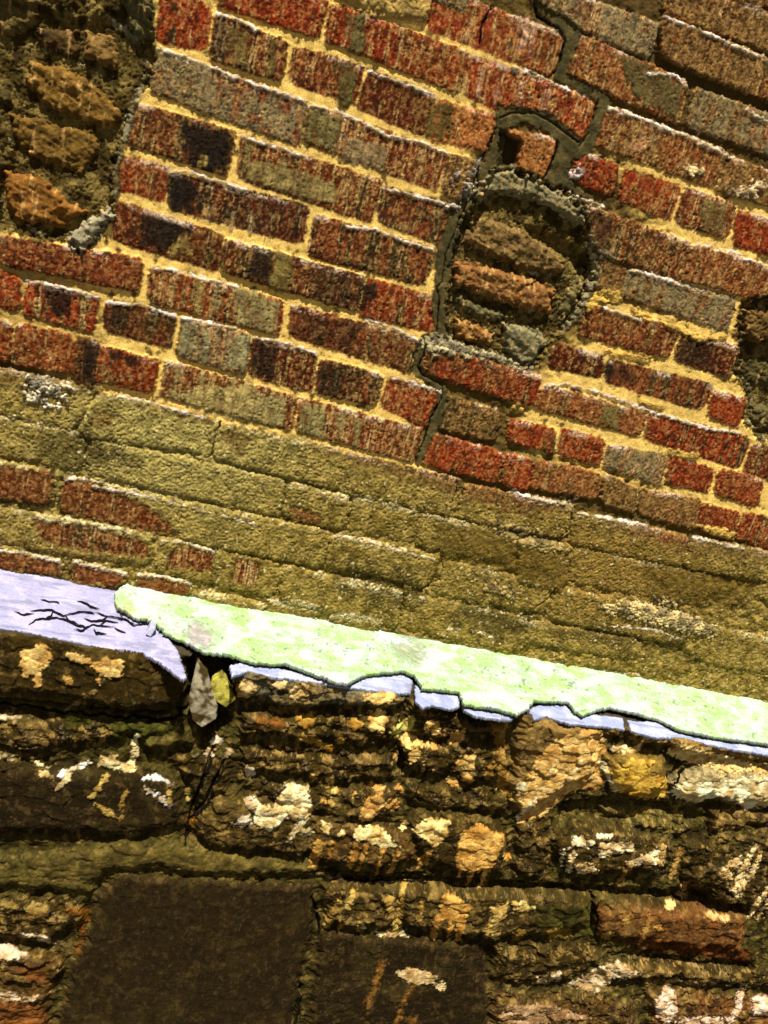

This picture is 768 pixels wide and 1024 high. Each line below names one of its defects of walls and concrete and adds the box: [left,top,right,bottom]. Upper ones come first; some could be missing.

crack [411,0,612,467]
spalling [446,164,616,373]
crack [15,599,149,634]
peeling [235,679,257,698]
peeling [272,680,309,699]
peeling [203,736,234,759]
peeling [295,690,468,772]
crack [184,754,225,845]